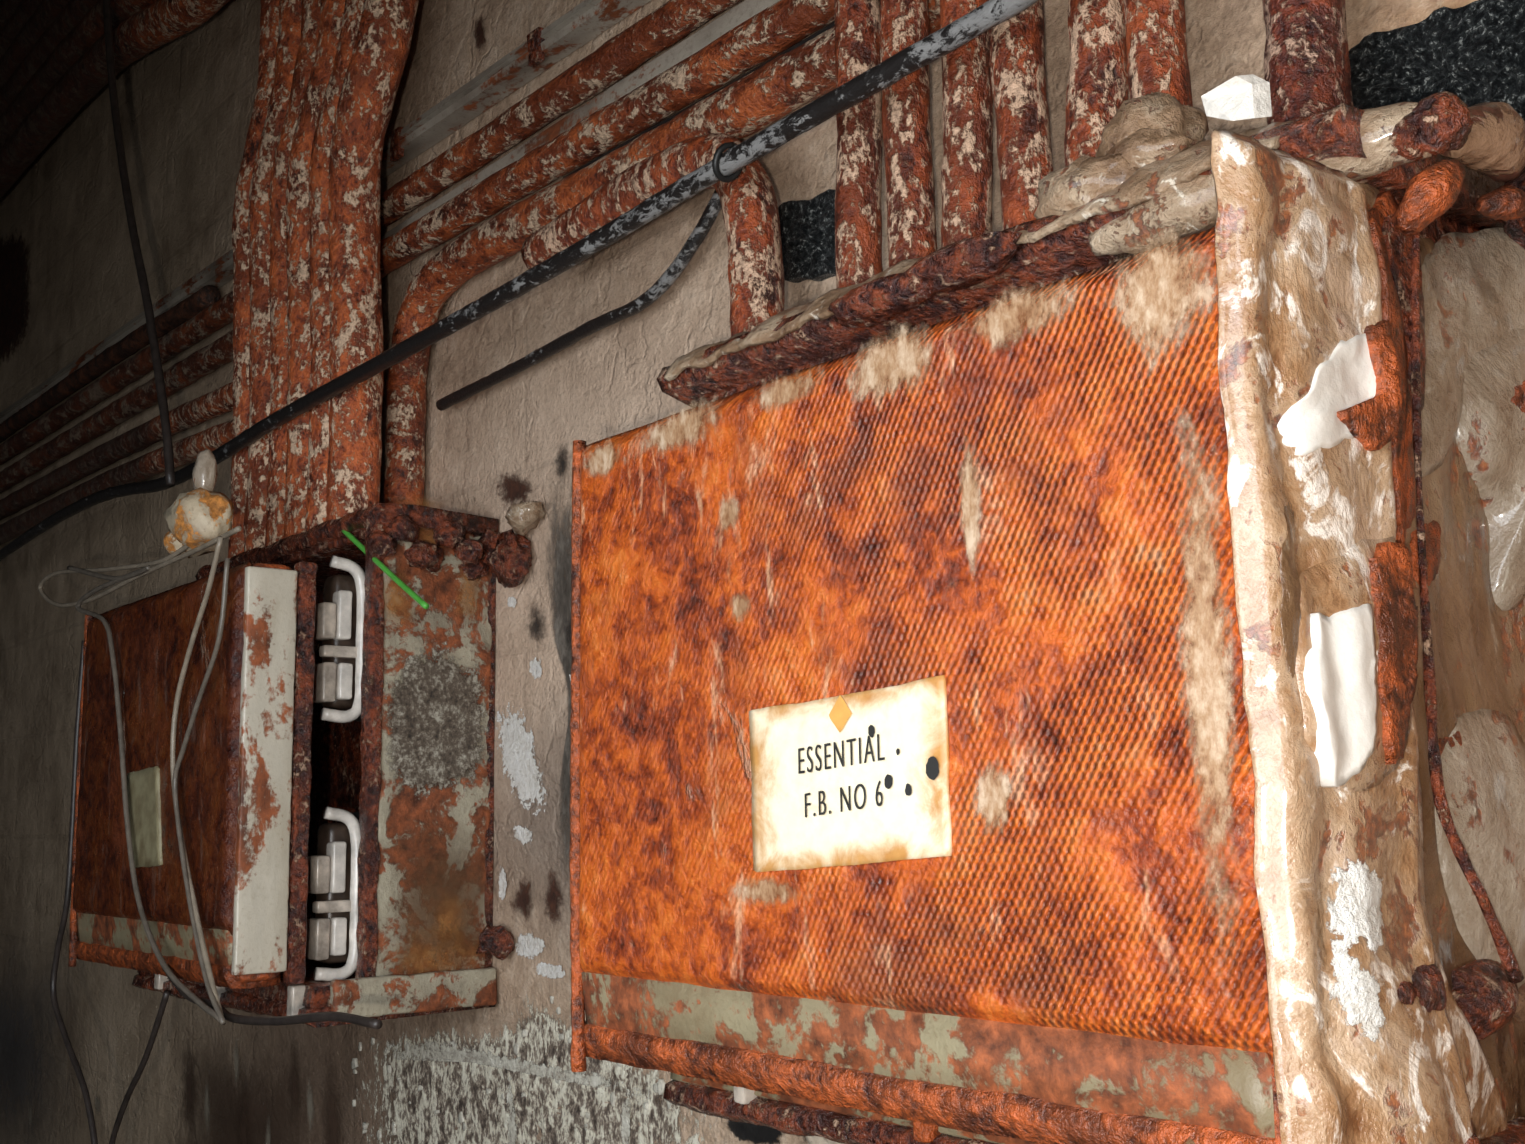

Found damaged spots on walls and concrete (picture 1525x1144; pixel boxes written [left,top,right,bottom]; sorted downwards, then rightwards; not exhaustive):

water stain [473,15,485,51]
water stain [727,1120,782,1144]